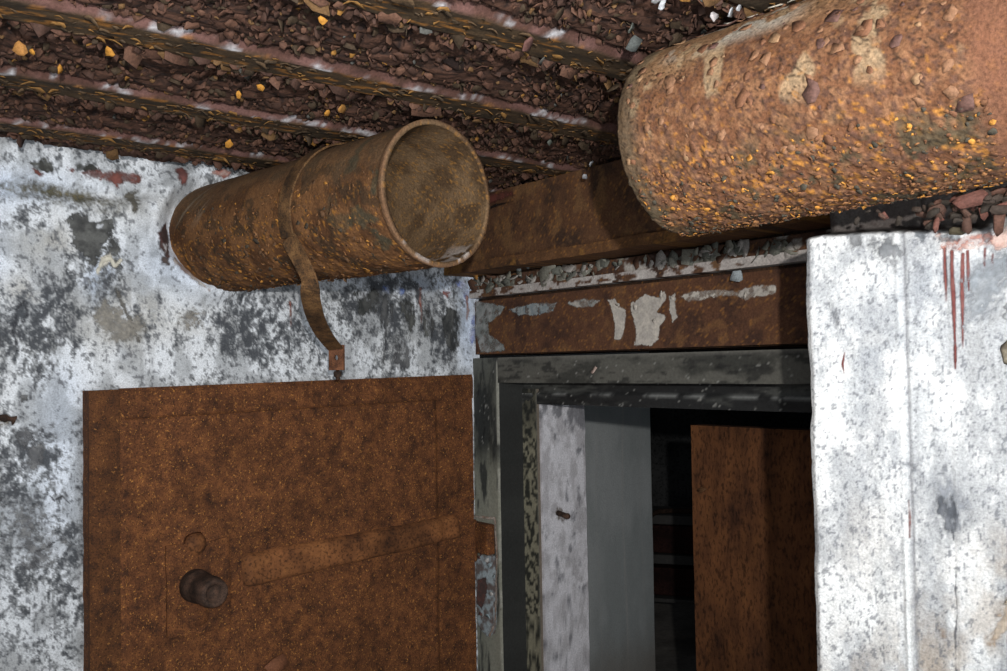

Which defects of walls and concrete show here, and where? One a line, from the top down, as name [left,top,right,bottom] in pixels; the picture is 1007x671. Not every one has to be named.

corrosion [0,0,776,193]
leakage [1,181,139,213]
leakage [93,290,147,342]
leakage [178,311,201,330]
leakage [353,288,459,371]
peeling [467,238,798,353]
corrosion [854,186,1007,369]
leakage [12,428,44,470]
leakage [14,512,66,569]